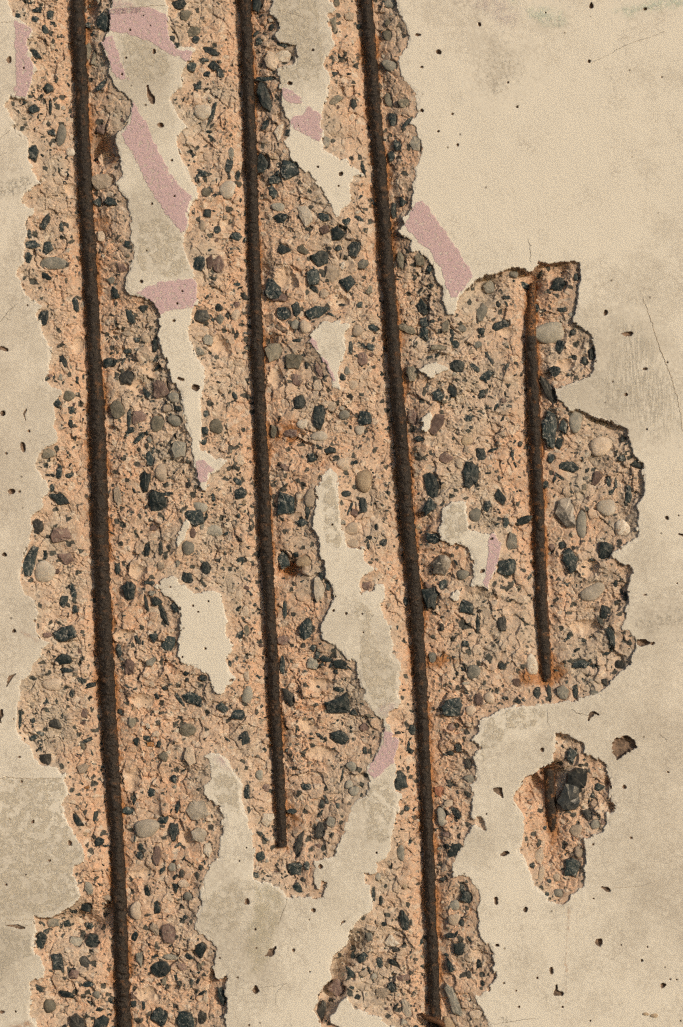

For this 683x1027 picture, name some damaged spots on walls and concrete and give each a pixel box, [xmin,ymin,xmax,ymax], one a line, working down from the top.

corrosion [360,35,381,85]
corrosion [77,170,109,338]
corrosion [369,142,397,267]
corrosion [381,301,403,352]
spalling [0,0,440,1027]
corrosion [252,421,305,495]
corrosion [392,420,420,580]
spalling [361,0,644,1027]
corrosion [526,408,549,586]
corrosion [408,577,453,688]
corrosion [266,684,286,750]
corrosion [416,702,444,1008]